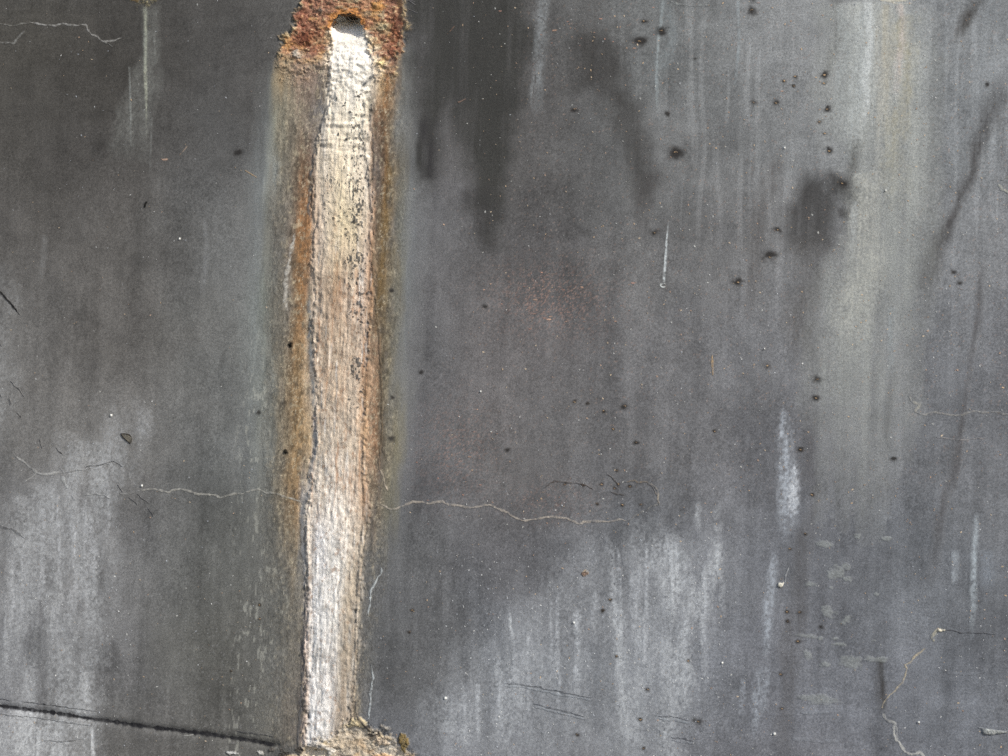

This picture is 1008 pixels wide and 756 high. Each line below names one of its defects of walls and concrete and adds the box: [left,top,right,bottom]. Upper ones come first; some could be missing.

crack [0,21,123,47]
rust [254,0,414,752]
leakage [296,0,689,747]
leakage [730,0,1008,756]
crack [15,439,301,516]
crack [378,469,660,525]
spalling [256,715,417,756]
leakage [409,501,743,756]
crack [881,628,996,756]